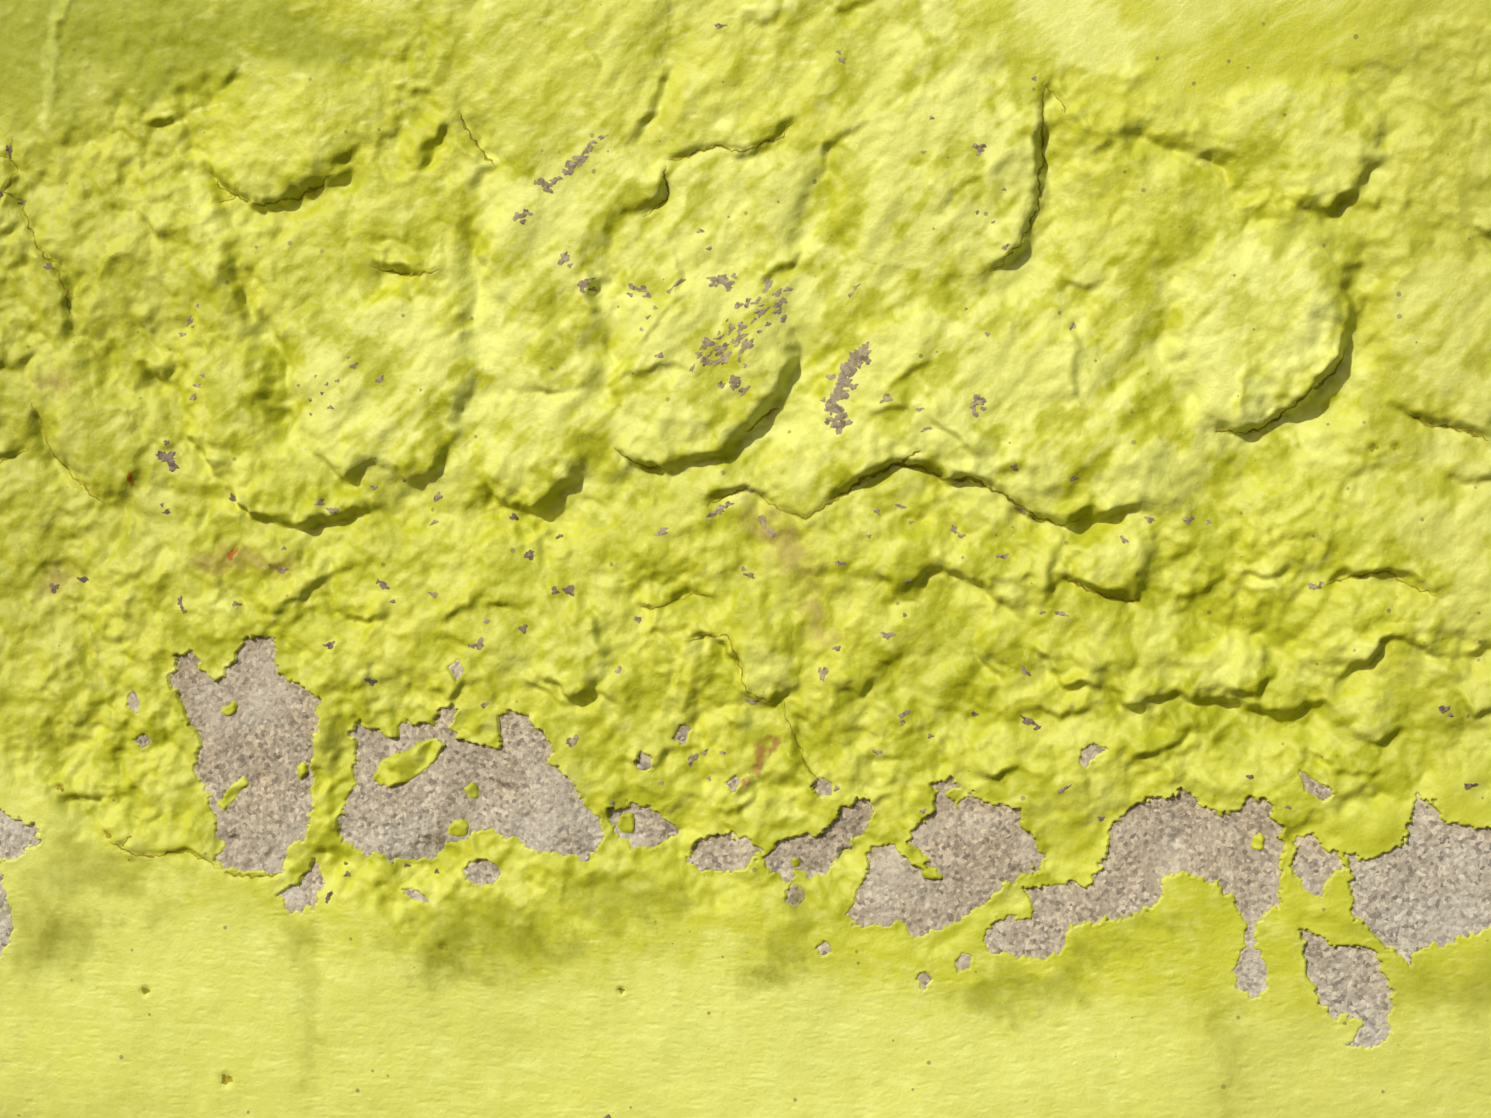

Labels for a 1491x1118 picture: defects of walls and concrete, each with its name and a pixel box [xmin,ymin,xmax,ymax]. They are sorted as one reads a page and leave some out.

crack [0,138,70,320]
crack [706,450,1088,527]
peeling [551,585,575,597]
peeling [448,618,490,681]
peeling [169,636,333,913]
peeling [338,702,679,877]
peeling [673,724,726,768]
peeling [1080,743,1108,767]
peeling [1299,770,1332,801]
peeling [0,809,42,957]
peeling [463,859,501,887]
peeling [687,775,1491,1048]